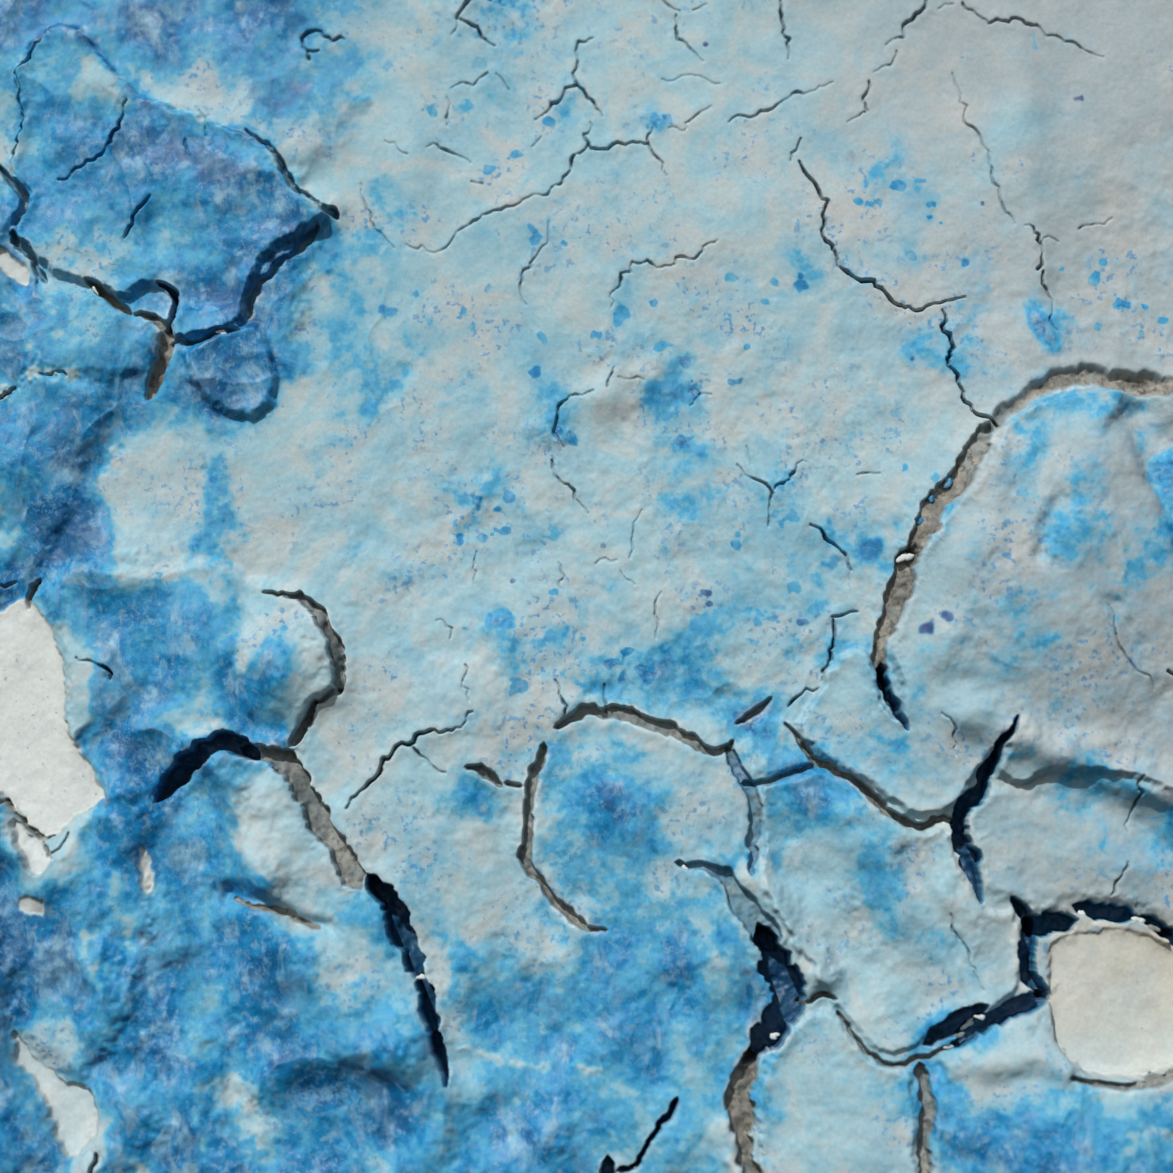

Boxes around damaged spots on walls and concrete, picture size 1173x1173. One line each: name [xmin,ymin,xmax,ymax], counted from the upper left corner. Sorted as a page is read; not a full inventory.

crack [0,30,51,296]
crack [57,98,128,182]
crack [81,0,835,405]
crack [847,0,1106,124]
crack [951,72,1114,332]
crack [0,370,69,401]
peeling [0,25,771,1173]
crack [148,137,1173,1173]
peeling [747,717,1173,1173]